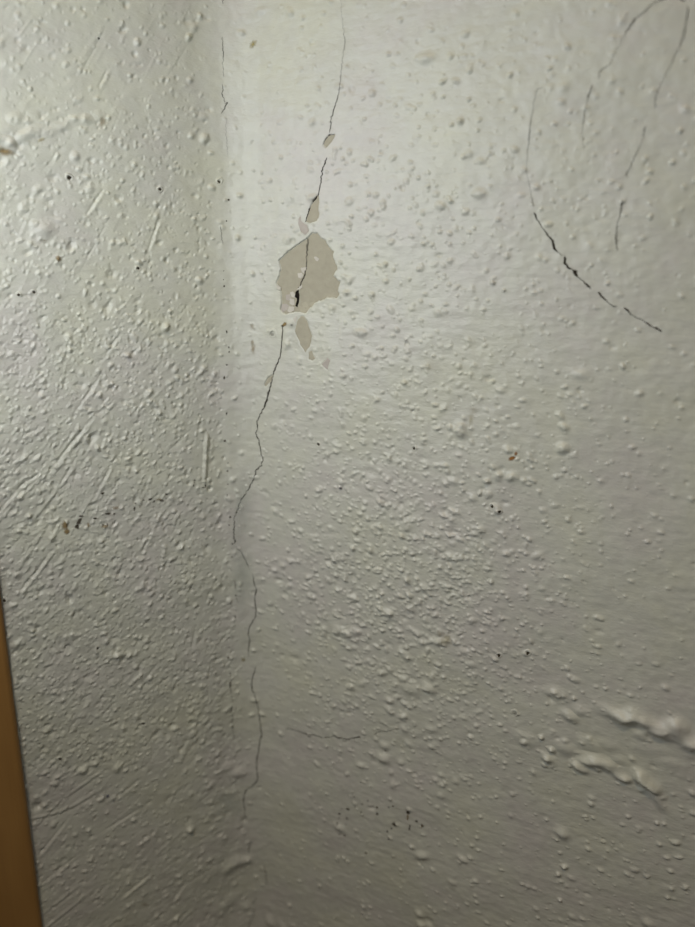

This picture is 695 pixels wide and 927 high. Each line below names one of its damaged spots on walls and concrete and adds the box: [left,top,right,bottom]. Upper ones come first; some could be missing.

peeling [276,196,340,370]
crack [305,158,327,222]
crack [534,213,662,332]
crack [227,327,283,814]